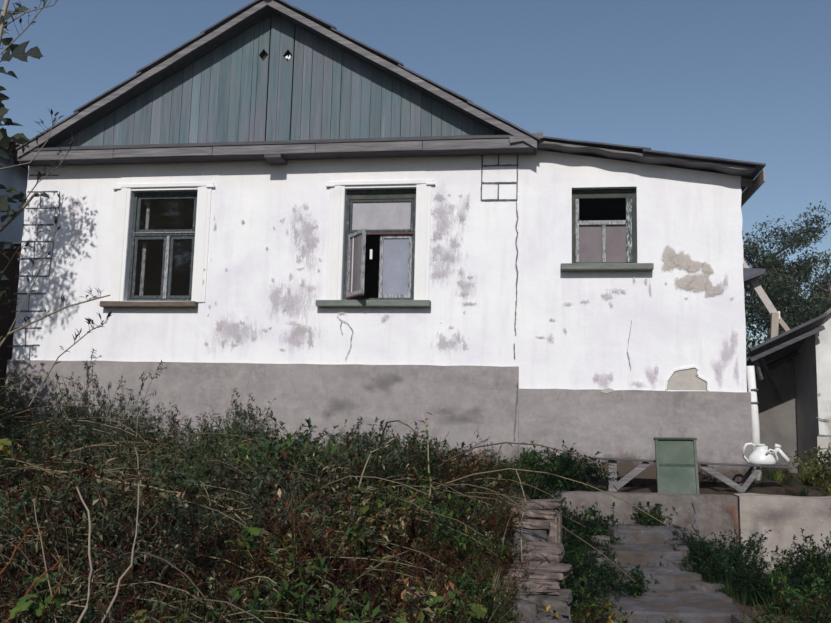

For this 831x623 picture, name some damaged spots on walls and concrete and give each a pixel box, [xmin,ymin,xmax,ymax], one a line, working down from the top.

peeling [289,206,321,280]
peeling [432,194,460,277]
peeling [457,269,476,313]
crack [511,201,519,358]
crack [512,383,520,440]
spalling [665,366,709,391]